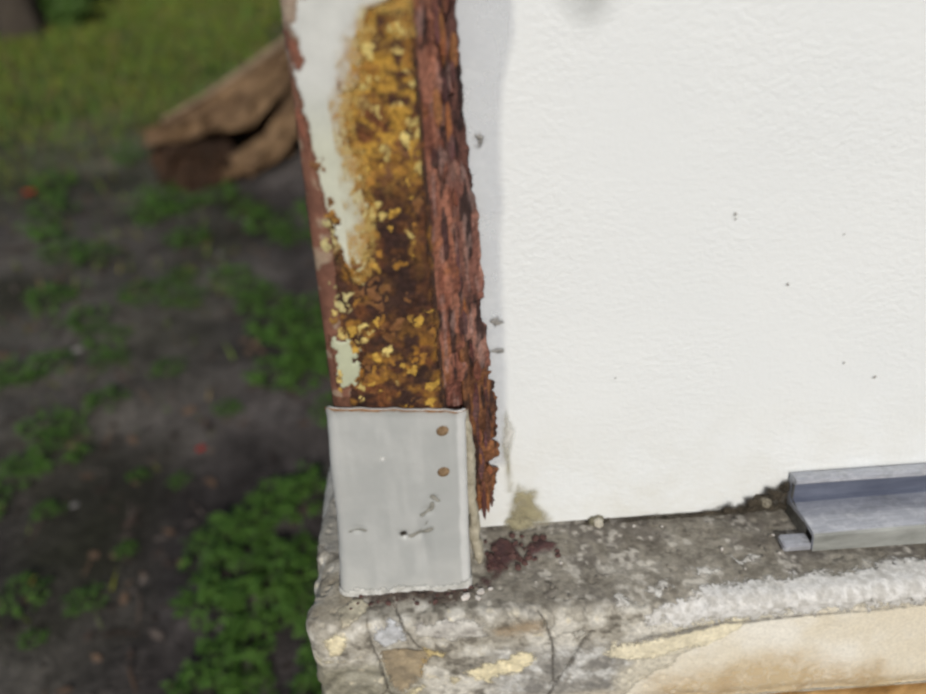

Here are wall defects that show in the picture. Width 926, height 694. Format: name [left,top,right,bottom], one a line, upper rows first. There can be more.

peeling [280,0,352,397]
rust [320,0,500,519]
peeling [317,492,339,554]
rust [482,538,556,585]
peeling [317,567,472,664]